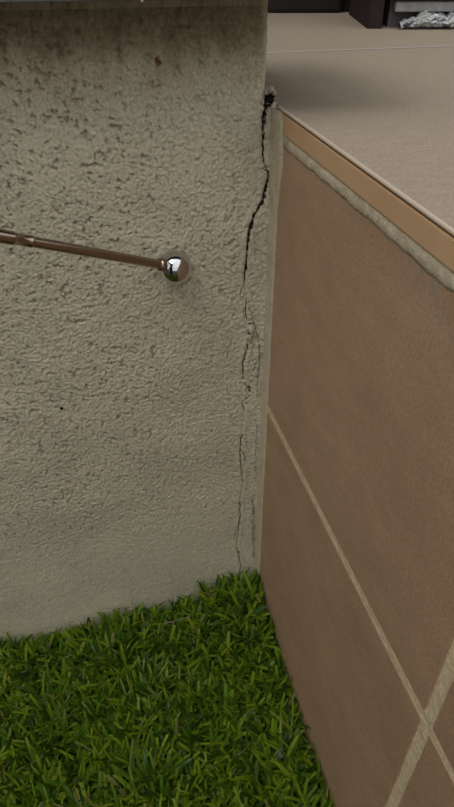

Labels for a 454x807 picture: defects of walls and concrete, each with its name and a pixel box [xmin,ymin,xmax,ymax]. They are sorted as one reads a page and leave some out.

crack [239,98,274,482]